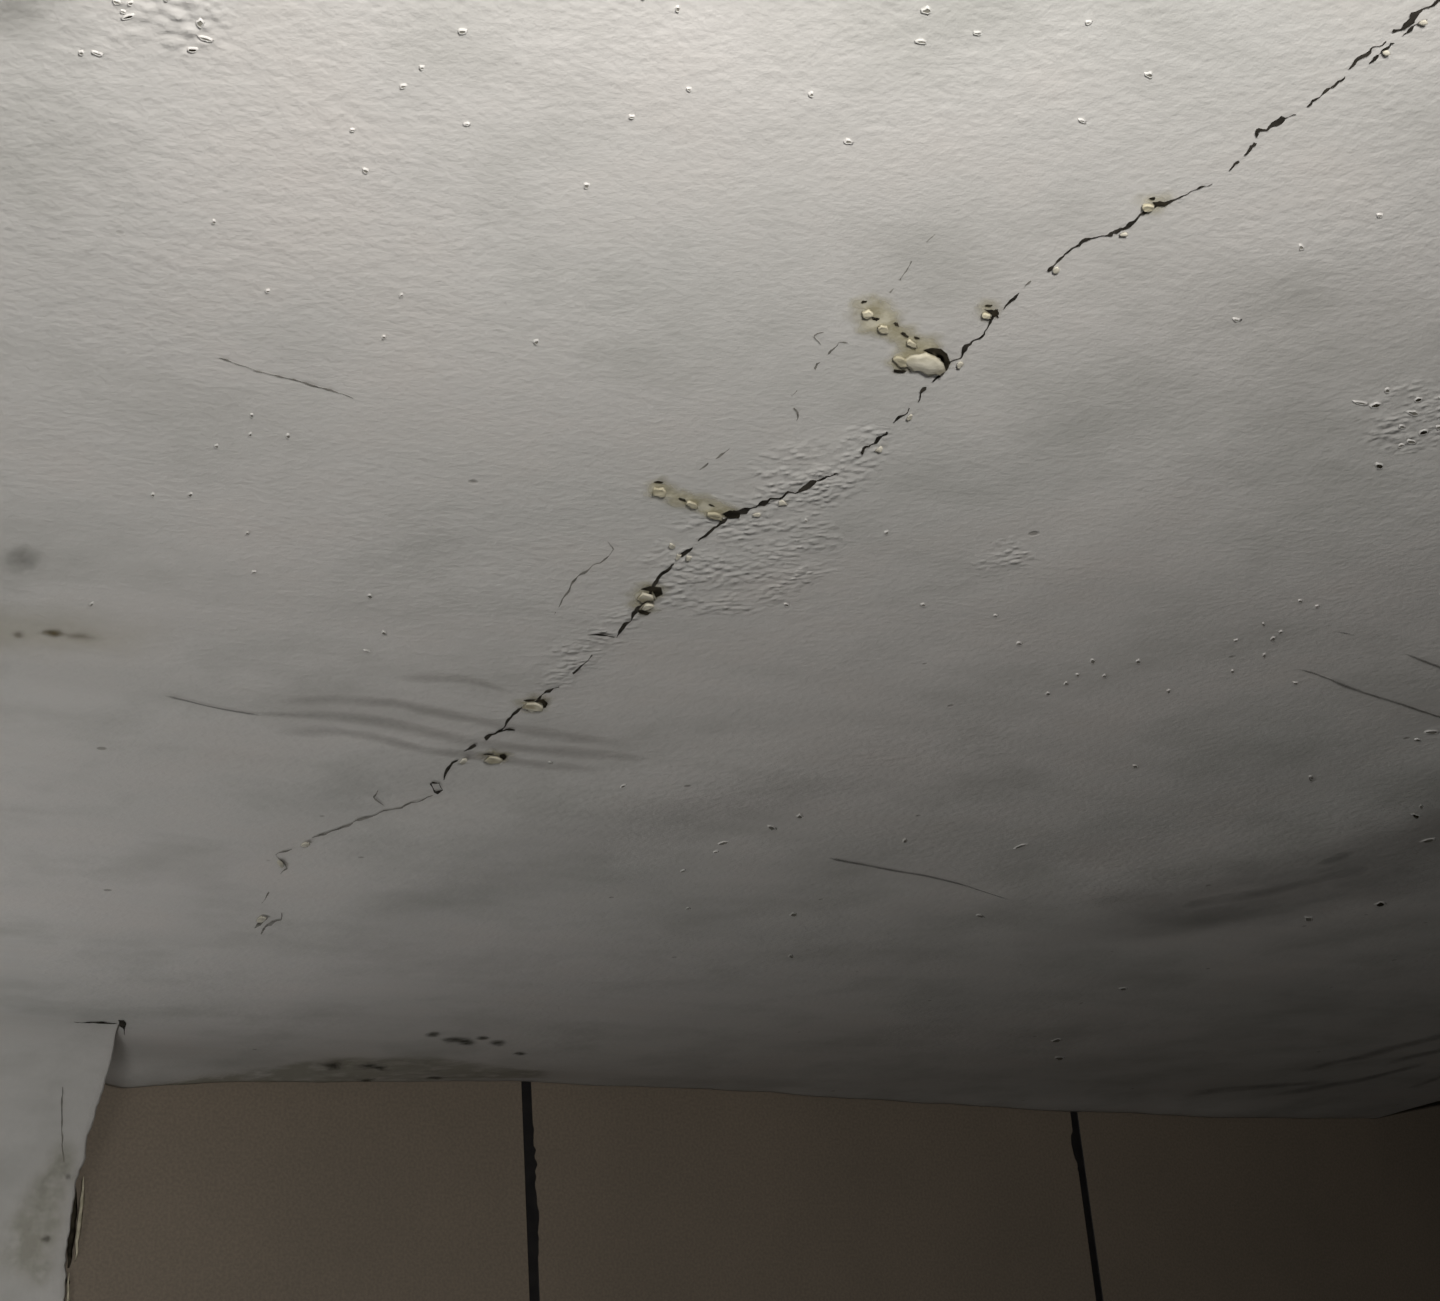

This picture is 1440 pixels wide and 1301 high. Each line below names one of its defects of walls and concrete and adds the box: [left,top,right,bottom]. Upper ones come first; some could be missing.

spalling [854,298,950,376]
crack [220,358,352,398]
spalling [649,481,740,521]
crack [255,0,1440,934]
crack [75,1020,126,1035]
crack [58,1087,66,1162]